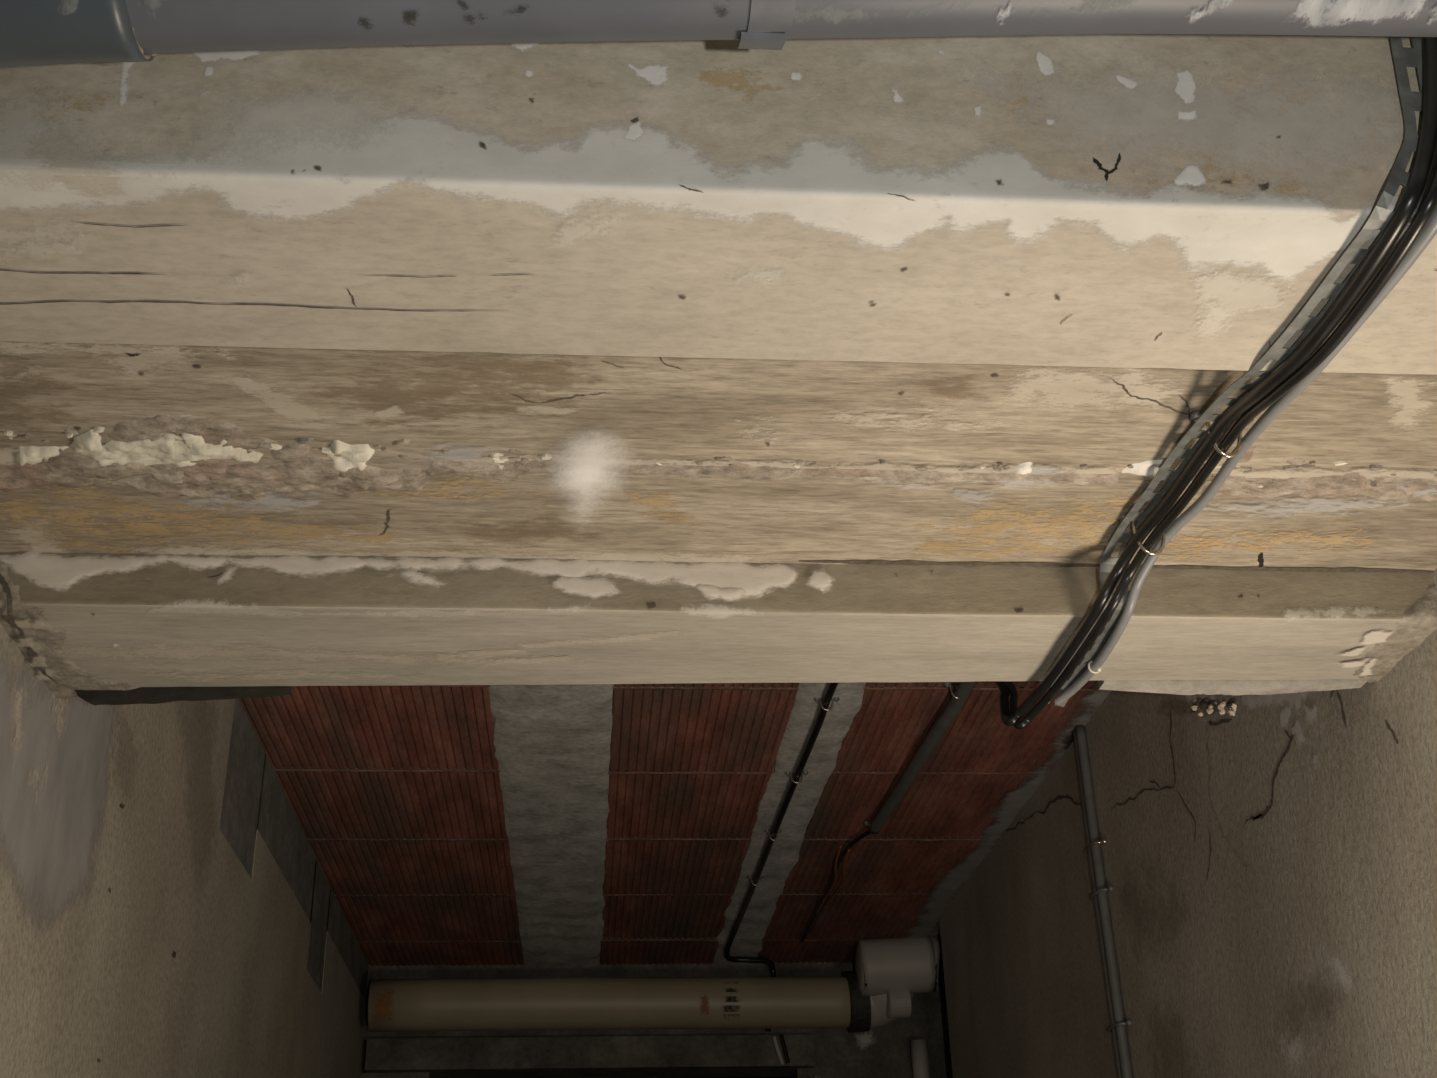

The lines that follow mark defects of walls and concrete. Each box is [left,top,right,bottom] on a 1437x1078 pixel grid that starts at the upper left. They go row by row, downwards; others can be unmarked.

spalling [1093,153,1121,181]
damp [0,429,263,467]
damp [327,440,375,472]
damp [1230,469,1437,482]
crack [799,560,1100,568]
crack [1139,553,1434,573]
peeling [552,576,619,598]
peeling [697,584,746,601]
peeling [808,569,834,591]
crack [0,573,57,683]
peeling [1341,631,1392,676]
crack [1005,708,1295,881]